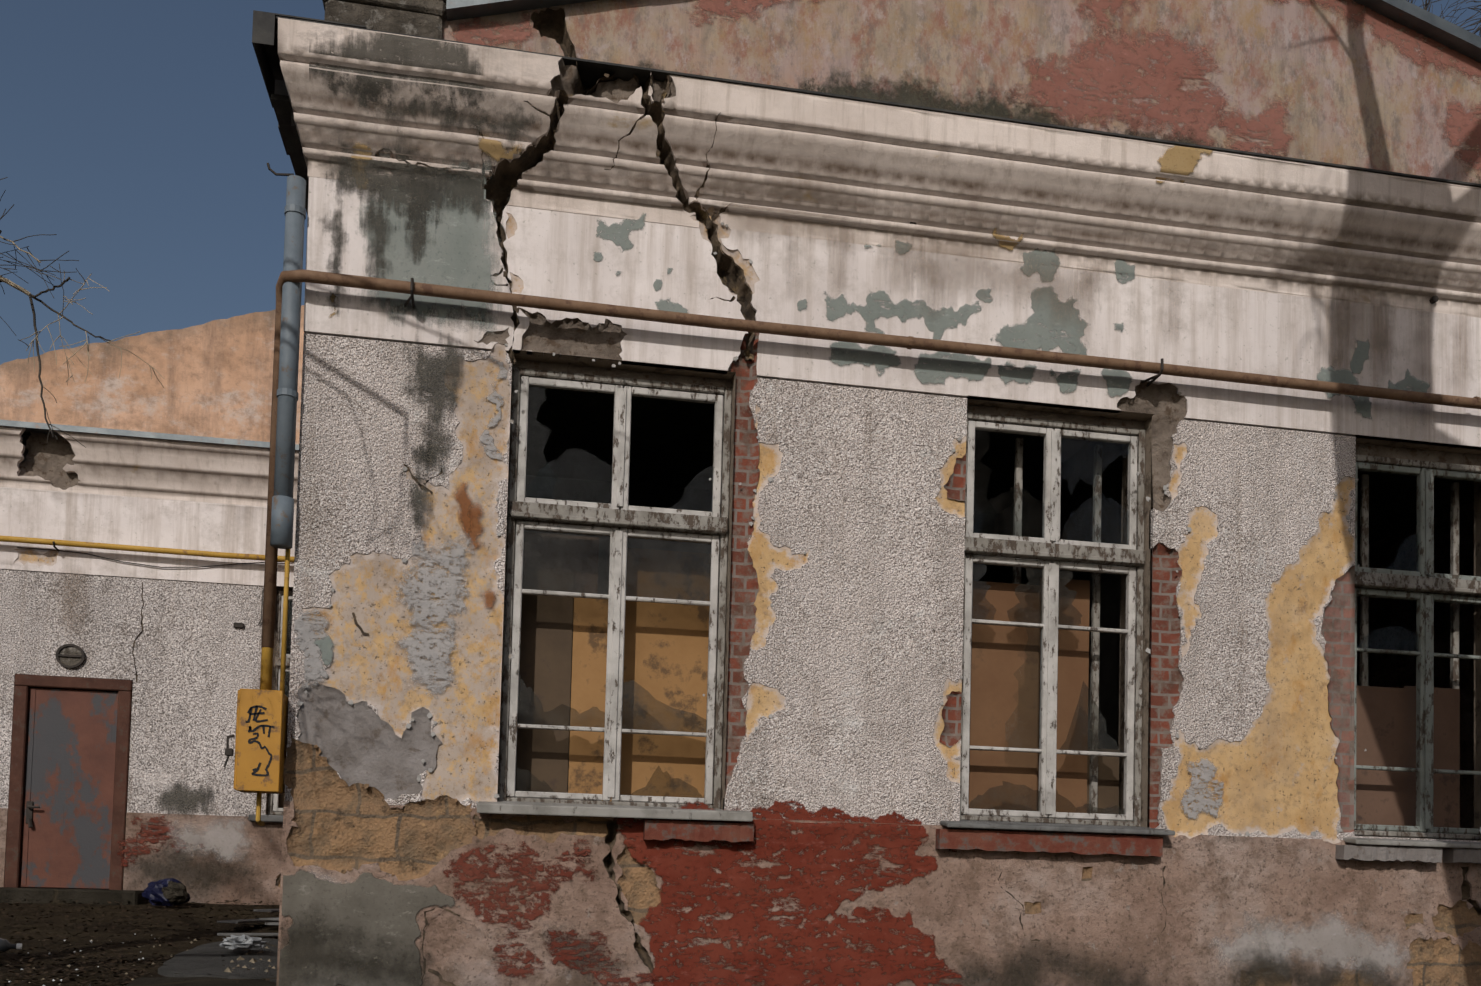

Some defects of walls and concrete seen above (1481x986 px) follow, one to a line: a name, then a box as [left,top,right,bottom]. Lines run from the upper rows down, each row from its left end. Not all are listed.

peeling [1008,0,1293,156]
peeling [1274,0,1481,83]
leakage [324,211,345,307]
leakage [336,144,490,278]
crack [375,8,756,365]
peeling [825,249,1087,393]
leakage [405,341,463,526]
flaking render [1101,369,1187,512]
flaking render [277,168,966,986]
flaking render [1137,477,1367,844]
crack [602,820,654,986]
flaking render [1404,900,1481,986]